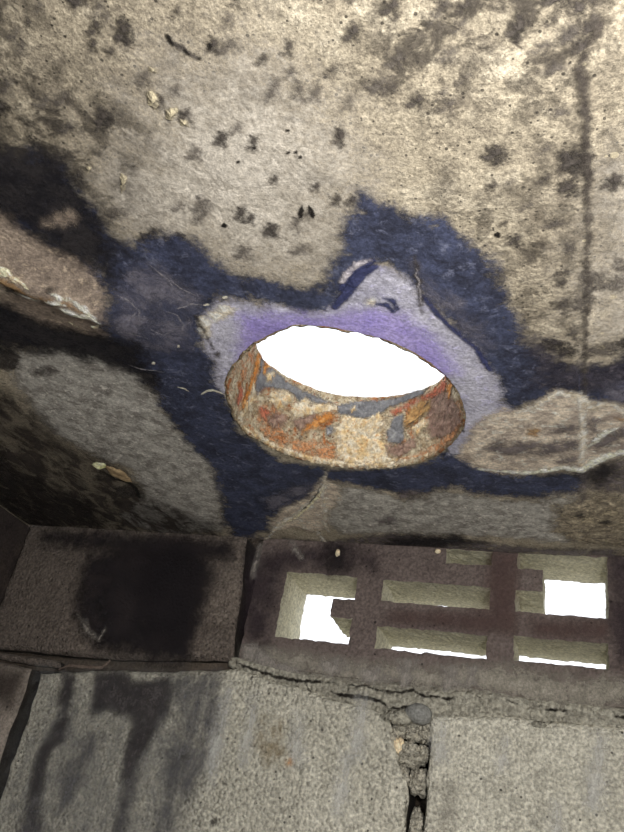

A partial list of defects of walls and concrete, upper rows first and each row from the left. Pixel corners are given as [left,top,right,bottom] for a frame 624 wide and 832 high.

leakage [66,0,133,57]
leakage [366,0,599,103]
leakage [105,55,356,269]
leakage [481,144,508,166]
corrosion [237,352,269,410]
corrosion [257,404,338,460]
leakage [195,267,624,492]
corrosion [385,376,462,461]
leakage [0,350,223,662]
leakage [326,488,577,542]
crack [239,663,453,710]
leakage [93,672,221,832]